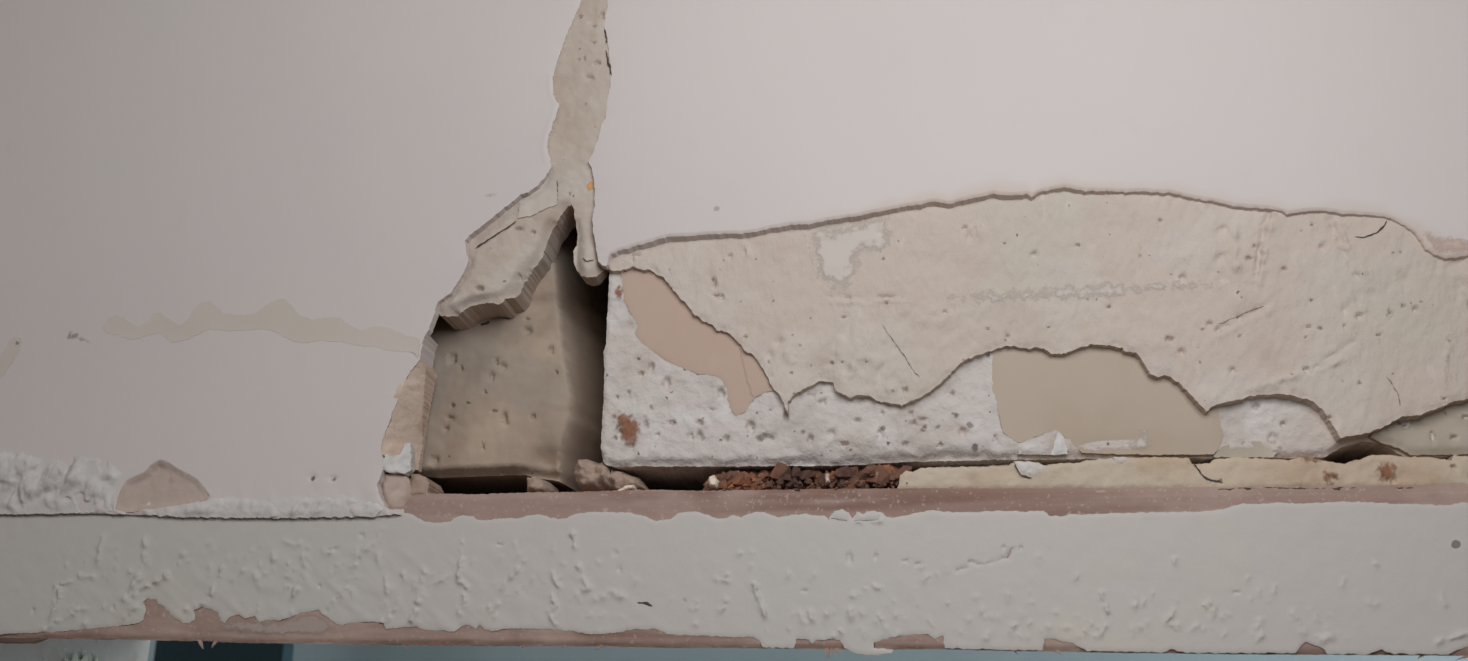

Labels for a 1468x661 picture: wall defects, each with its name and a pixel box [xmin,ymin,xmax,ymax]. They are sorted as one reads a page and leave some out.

flaking render [382,0,1468,523]
flaking render [115,461,210,513]
peeling [0,599,762,650]
peeling [875,634,945,649]